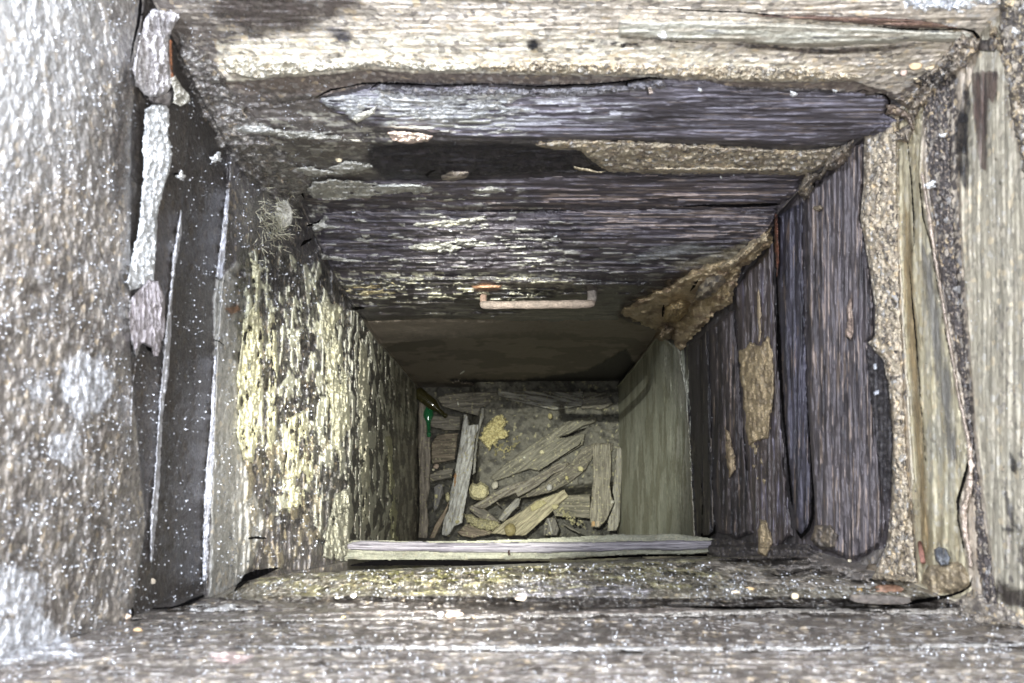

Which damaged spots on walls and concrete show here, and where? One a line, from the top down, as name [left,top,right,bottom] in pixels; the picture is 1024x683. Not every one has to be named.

crack [316,77,667,97]
peeling [441,171,469,181]
leakage [345,282,395,297]
corrosion [473,283,501,291]